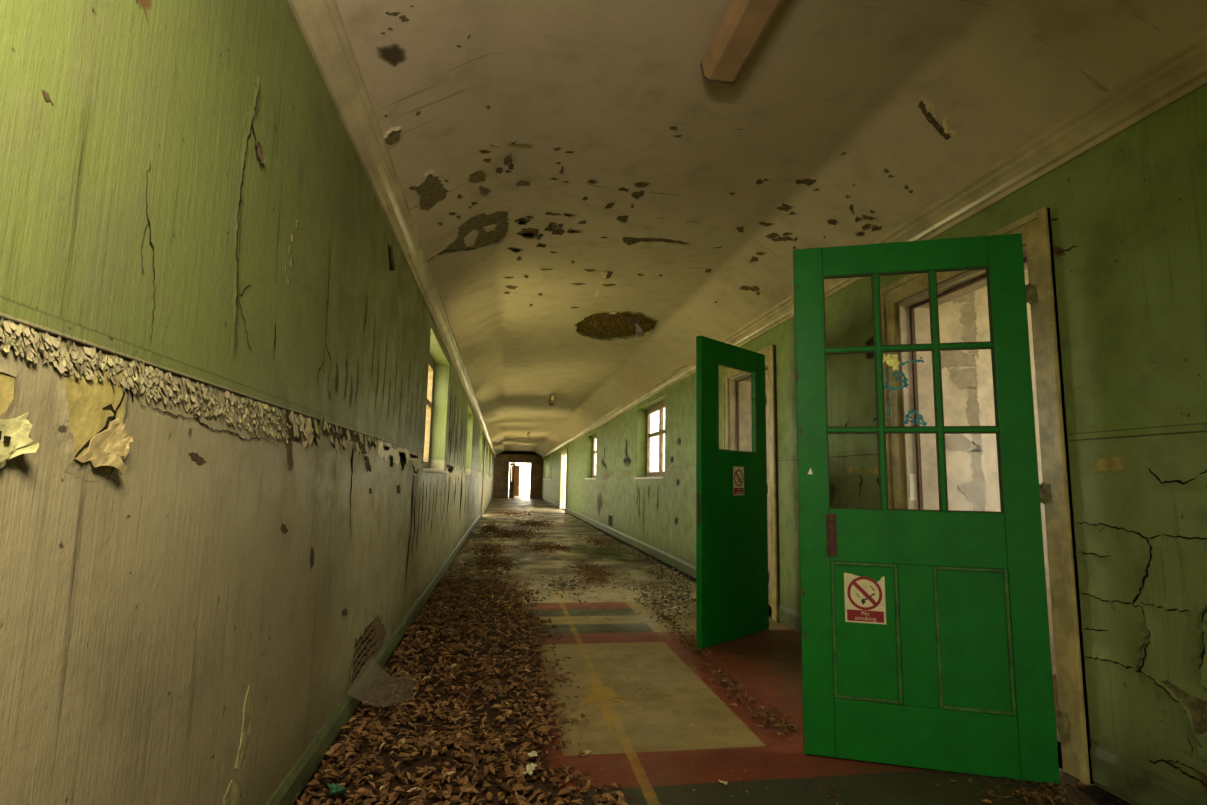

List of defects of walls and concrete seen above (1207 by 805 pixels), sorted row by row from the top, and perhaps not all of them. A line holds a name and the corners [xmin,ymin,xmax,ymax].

peeling [383,110,422,148]
crack [229,73,283,361]
peeling [403,141,696,309]
peeling [793,176,821,192]
peeling [733,183,885,265]
peeling [737,284,762,296]
crack [1075,457,1207,755]